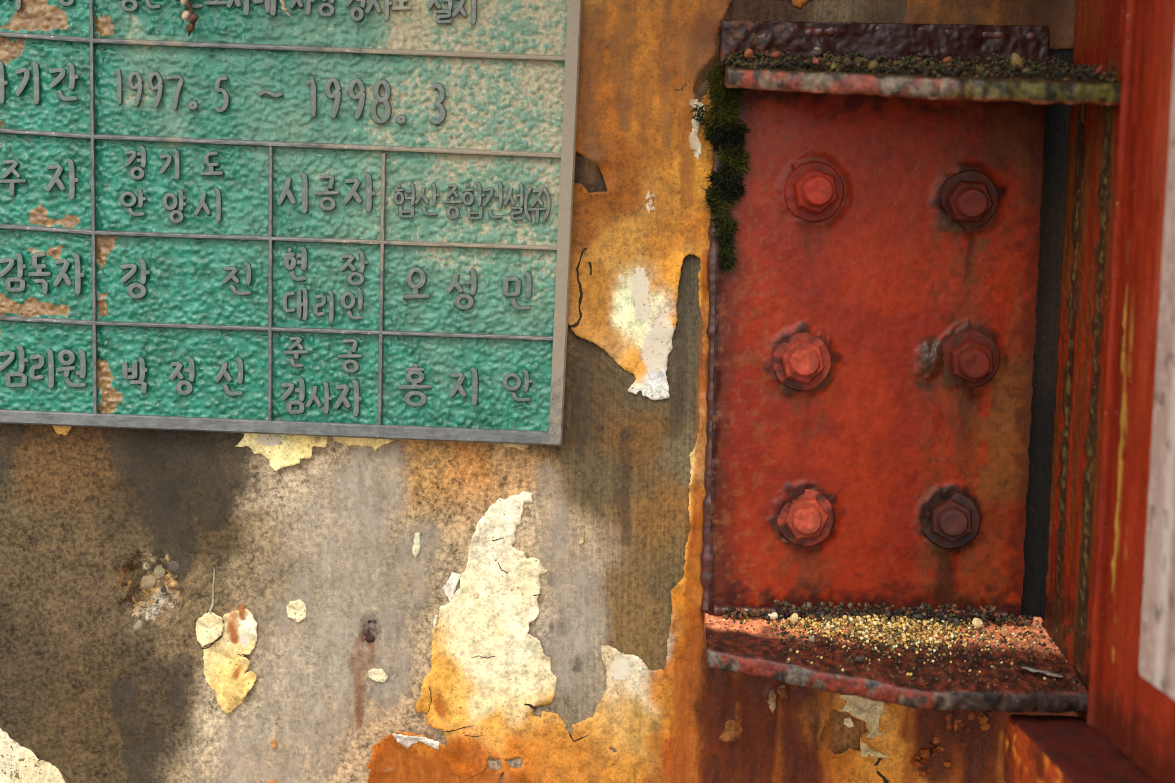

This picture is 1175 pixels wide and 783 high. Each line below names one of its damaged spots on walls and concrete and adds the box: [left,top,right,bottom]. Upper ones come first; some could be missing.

peeling [904,0,1075,50]
peeling [568,0,732,400]
water stain [102,428,257,581]
peeling [196,608,258,714]
peeling [235,433,395,471]
water stain [194,439,438,783]
water stain [537,462,605,691]
peeling [367,406,1078,783]
rust [670,249,832,783]
peeling [0,728,66,783]
rust [374,741,525,783]
rust [903,707,1004,783]